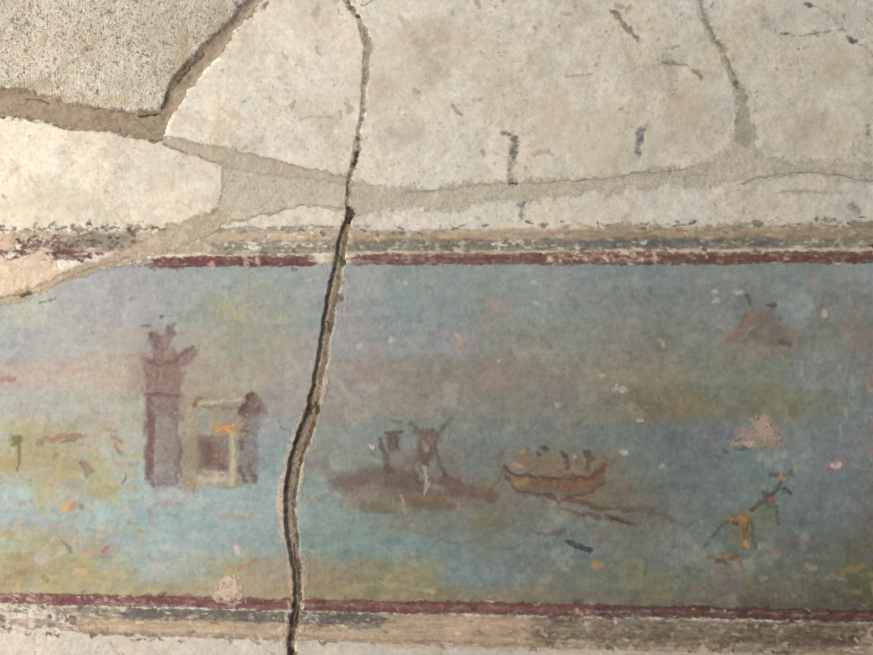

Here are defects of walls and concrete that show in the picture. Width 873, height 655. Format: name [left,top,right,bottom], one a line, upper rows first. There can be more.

crack [804,2,856,44]
crack [699,0,756,145]
spalling [0,233,61,298]
crack [0,211,226,305]
crack [276,0,373,655]